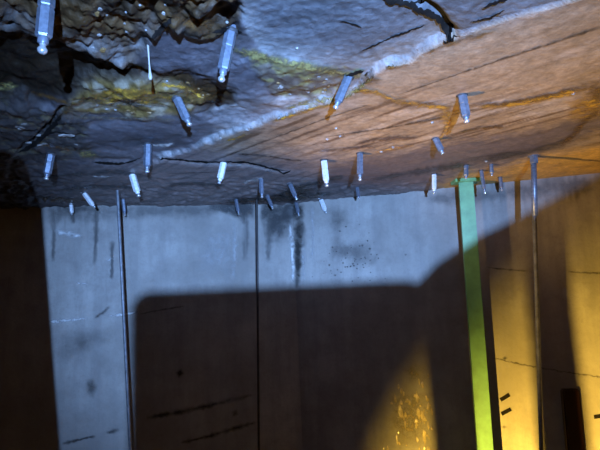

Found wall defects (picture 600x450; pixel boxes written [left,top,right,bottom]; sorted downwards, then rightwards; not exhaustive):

crack [363,0,459,51]
crack [471,0,507,22]
spalling [0,0,585,166]
crack [18,114,68,153]
crack [160,154,301,174]
water stain [212,176,342,279]